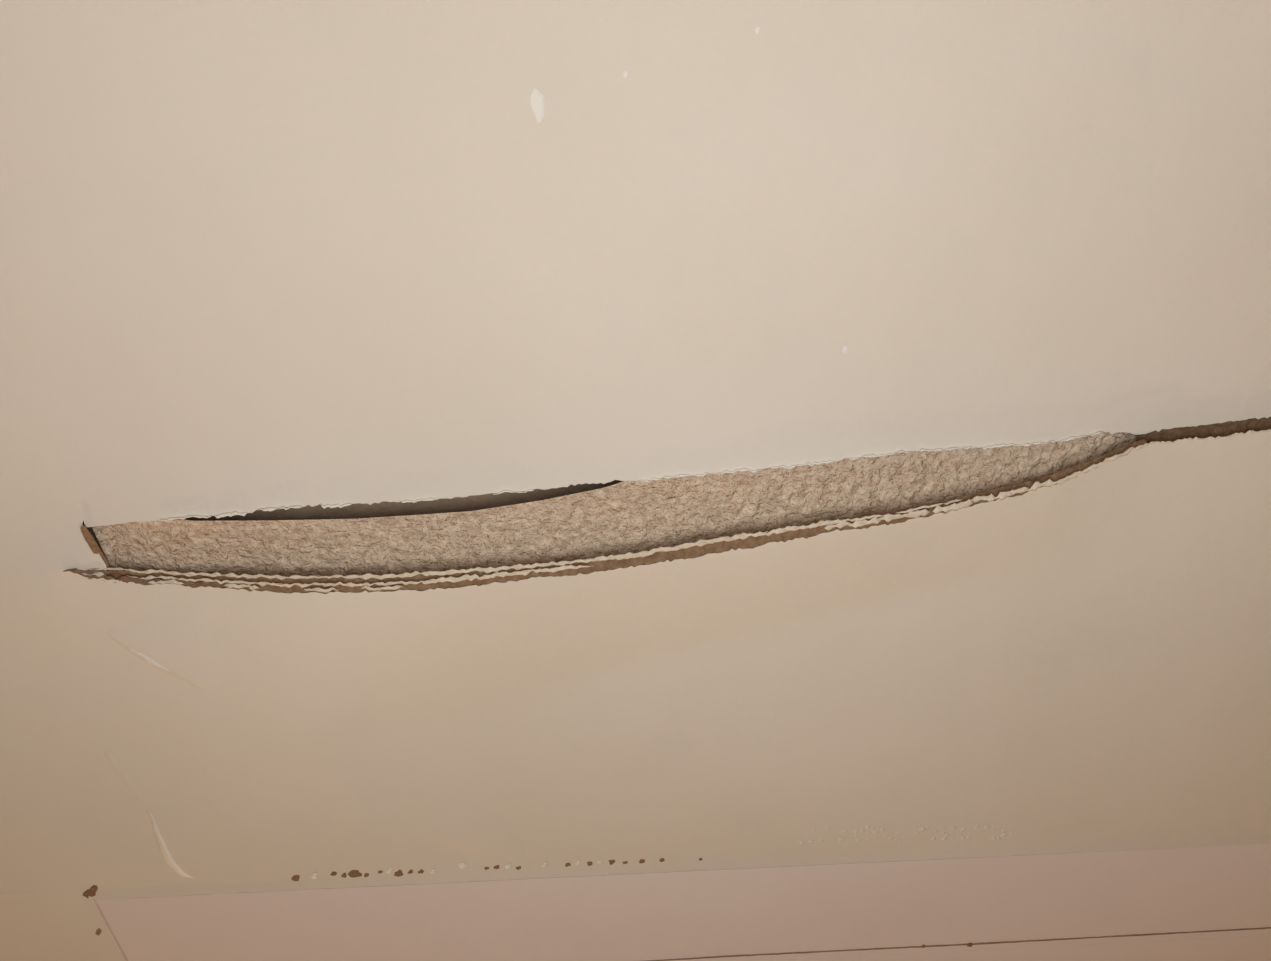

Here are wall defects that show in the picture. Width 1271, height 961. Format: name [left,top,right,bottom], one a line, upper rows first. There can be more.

crack [1136,417,1271,445]